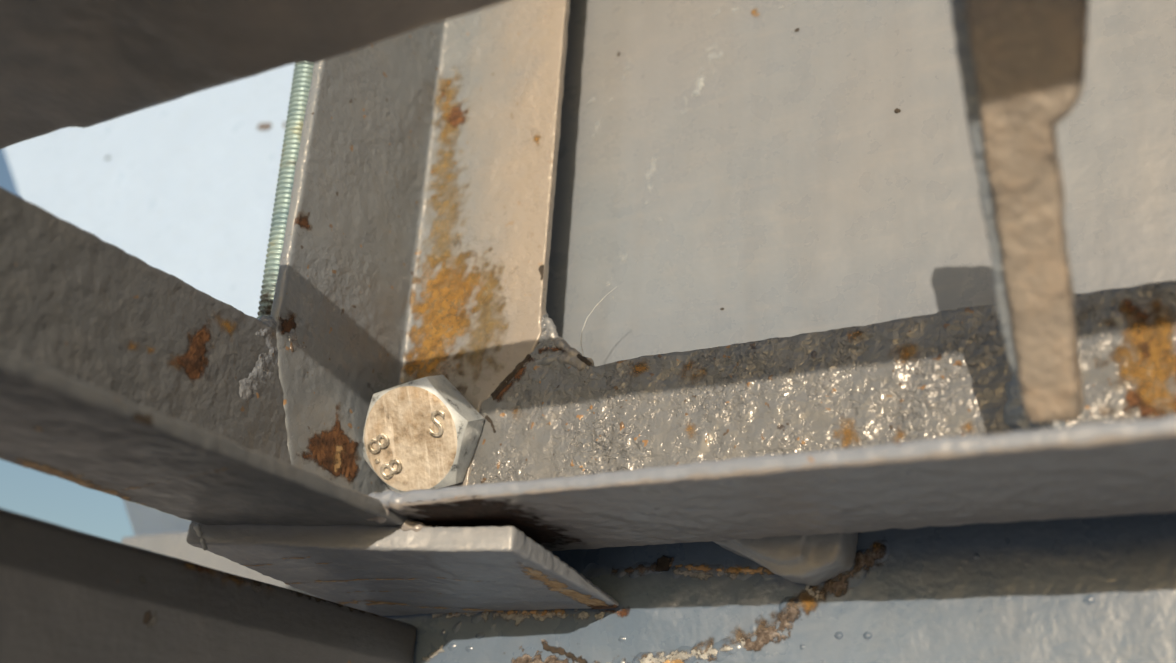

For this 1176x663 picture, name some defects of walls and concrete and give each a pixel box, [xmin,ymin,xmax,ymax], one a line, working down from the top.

rust [405,79,506,379]
rust [171,325,210,379]
rust [1114,299,1176,417]
rust [302,407,359,481]
rust [407,495,581,545]
rust [589,604,630,618]